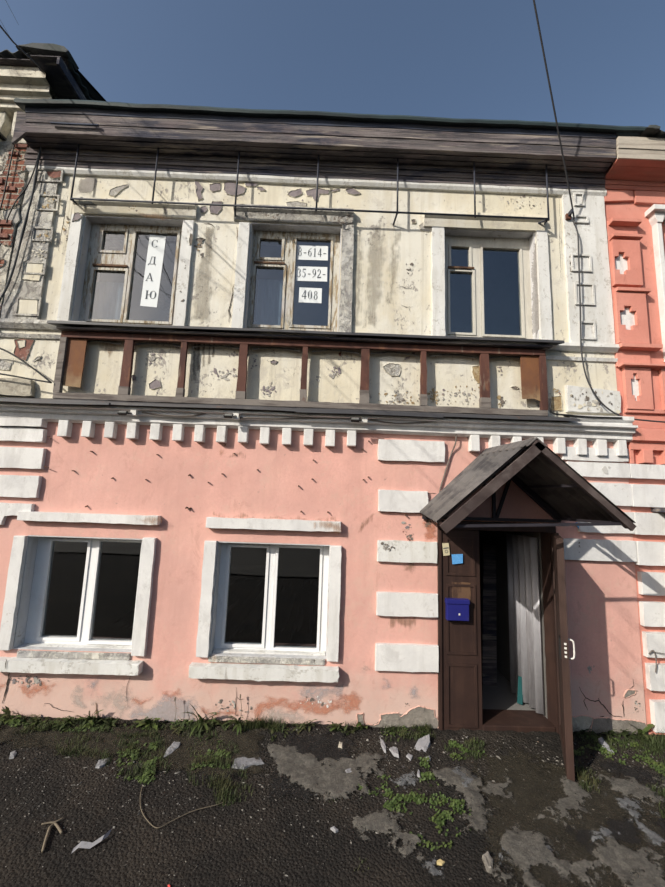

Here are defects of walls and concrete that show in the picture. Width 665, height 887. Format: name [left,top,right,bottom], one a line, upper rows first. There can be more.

spalling [0,143,30,247]
peeling [79,177,97,193]
peeling [109,184,129,197]
peeling [194,180,266,215]
peeling [263,188,361,220]
peeling [383,352,415,377]
peeling [149,379,162,394]
peeling [378,365,480,405]
peeling [9,675,49,694]
spalling [214,695,438,728]
crack [579,682,634,717]